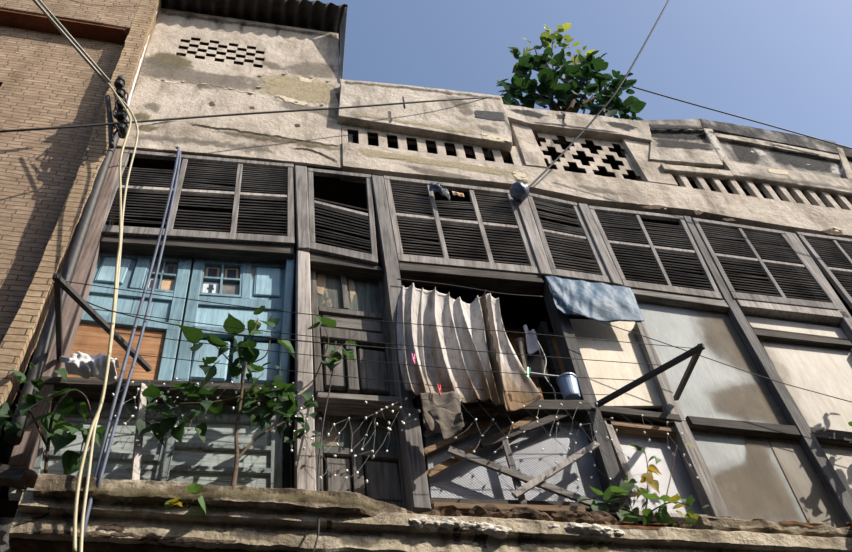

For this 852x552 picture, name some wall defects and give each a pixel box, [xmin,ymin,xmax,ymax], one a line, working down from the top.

leakage [140,58,258,89]
peeling [155,73,340,105]
leakage [263,62,336,77]
leakage [284,102,339,119]
peeling [347,278,356,303]
leakage [703,311,789,425]